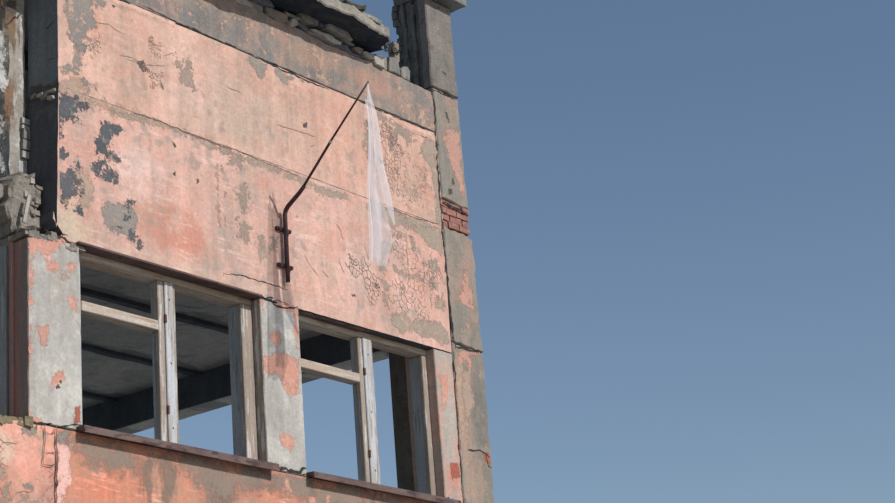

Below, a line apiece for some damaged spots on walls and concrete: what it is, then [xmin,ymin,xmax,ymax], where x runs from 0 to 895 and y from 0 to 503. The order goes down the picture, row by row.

peeling [30,0,348,217]
peeling [101,199,143,251]
peeling [233,182,284,261]
peeling [366,111,470,345]
crack [223,273,297,309]
crack [307,88,492,501]
spalling [50,369,66,390]
peeling [263,301,301,400]
peeling [457,350,480,439]
crack [0,439,33,500]
peeling [0,430,74,503]
crack [33,422,81,503]